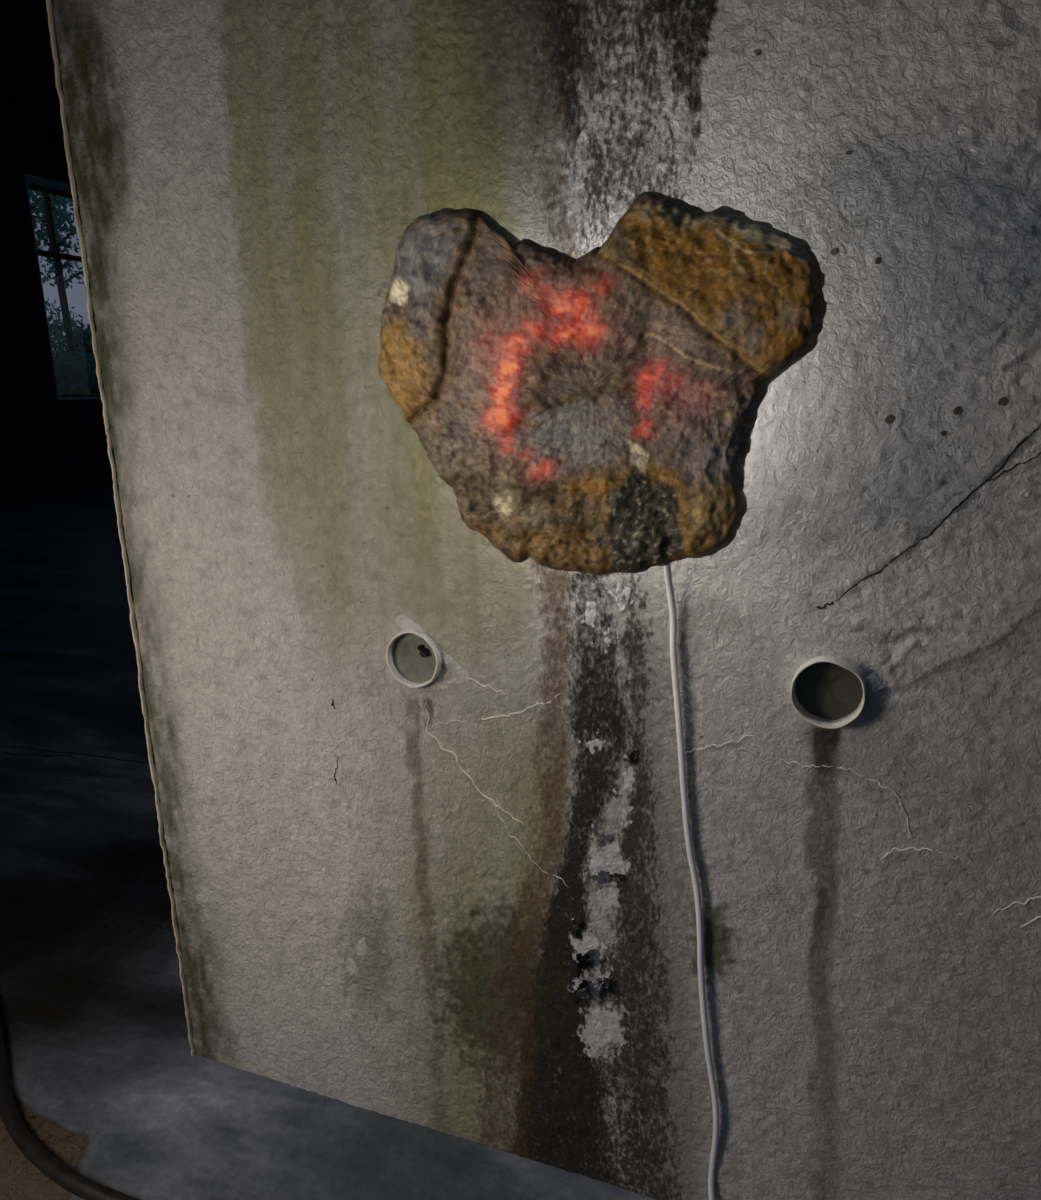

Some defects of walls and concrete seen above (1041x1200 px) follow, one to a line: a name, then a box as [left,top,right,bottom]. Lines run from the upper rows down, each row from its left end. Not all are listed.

leakage [507,0,718,257]
crack [816,424,1041,609]
leakage [456,564,682,1200]